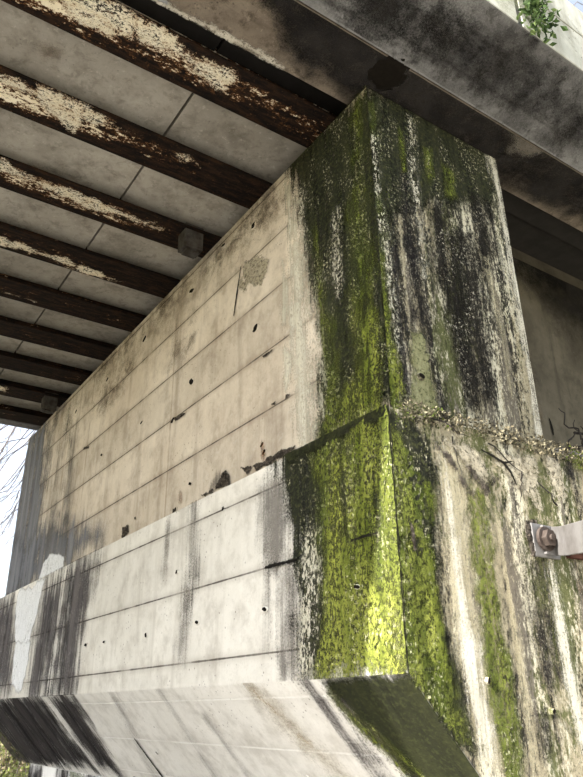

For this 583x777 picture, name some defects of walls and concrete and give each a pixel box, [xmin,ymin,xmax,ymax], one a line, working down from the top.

peeling [49,0,241,93]
peeling [0,73,135,134]
peeling [0,236,120,282]
peeling [0,157,164,231]
peeling [238,255,269,293]
leakage [153,0,583,445]
leakage [0,412,122,777]
leakage [263,475,424,777]
leakage [438,446,504,773]
leakage [508,545,583,767]
leakage [243,683,311,752]